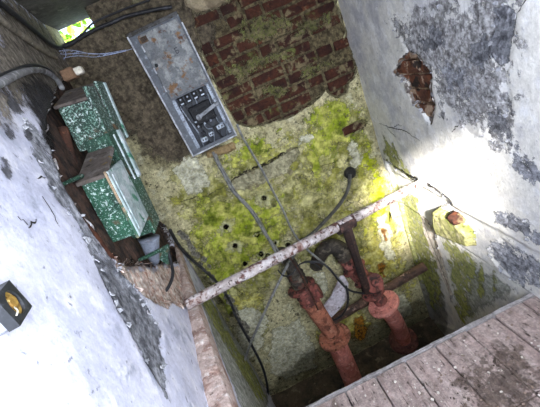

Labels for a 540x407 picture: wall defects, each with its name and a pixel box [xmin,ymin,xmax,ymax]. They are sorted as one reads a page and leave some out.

water stain [417,23,446,53]
flaking render [192,0,358,128]
water stain [438,32,490,102]
peeling [392,0,540,185]
water stain [487,107,514,148]
water stain [172,157,210,195]
water stain [347,140,363,168]
peeling [7,96,185,399]
water stain [375,214,396,261]
water stain [313,272,328,298]